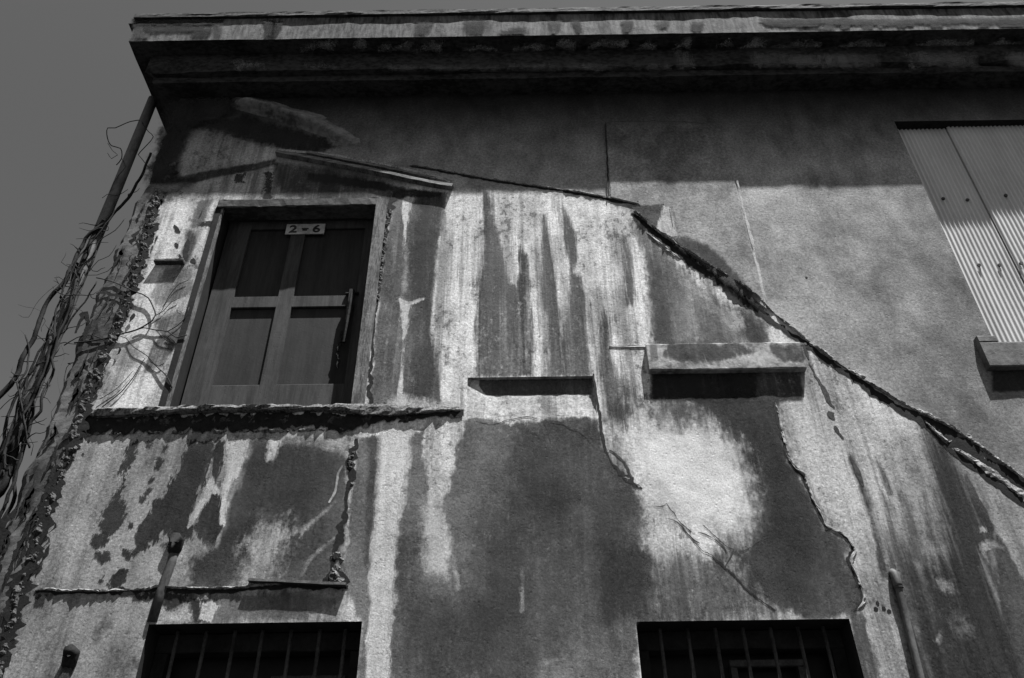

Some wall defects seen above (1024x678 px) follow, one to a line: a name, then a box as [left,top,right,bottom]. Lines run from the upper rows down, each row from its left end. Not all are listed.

water stain [33,593,49,608]
crack [0,162,359,678]
crack [367,191,397,404]
water stain [90,400,878,678]
water stain [474,191,629,430]
crack [480,373,776,611]
crack [409,120,1024,507]
water stain [873,432,1024,678]